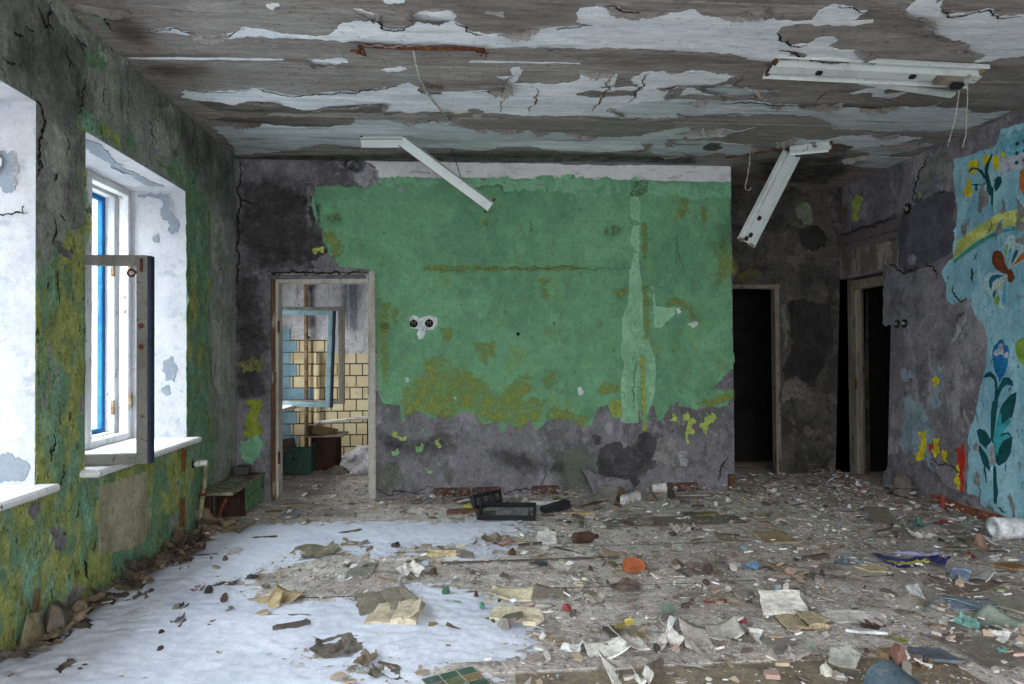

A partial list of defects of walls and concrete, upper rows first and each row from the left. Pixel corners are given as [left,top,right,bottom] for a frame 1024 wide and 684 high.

crack [14,1,161,182]
flaking render [46,0,283,68]
crack [592,74,647,110]
peeling [0,150,19,193]
peeling [76,113,180,245]
crack [218,162,255,317]
damp [236,180,327,398]
damp [234,154,419,172]
damp [430,153,695,164]
peeling [150,0,1024,328]
peeling [401,356,688,487]